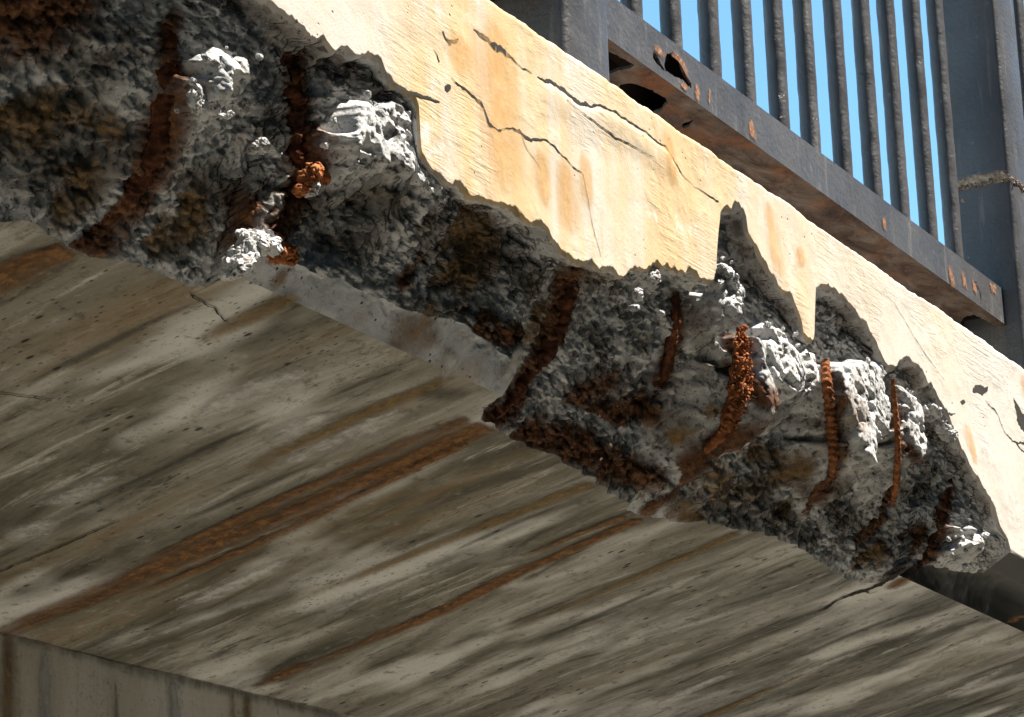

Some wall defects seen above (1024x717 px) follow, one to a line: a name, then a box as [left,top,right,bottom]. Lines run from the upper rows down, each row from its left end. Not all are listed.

spalling [186,83,210,116]
corrosion [68,10,207,259]
spalling [255,137,271,155]
corrosion [217,51,329,251]
crack [385,29,719,255]
spalling [291,162,324,198]
spalling [221,228,262,266]
spalling [248,228,287,265]
spalling [218,253,257,281]
spalling [714,263,735,279]
corrosion [0,267,848,717]
crack [815,569,908,615]